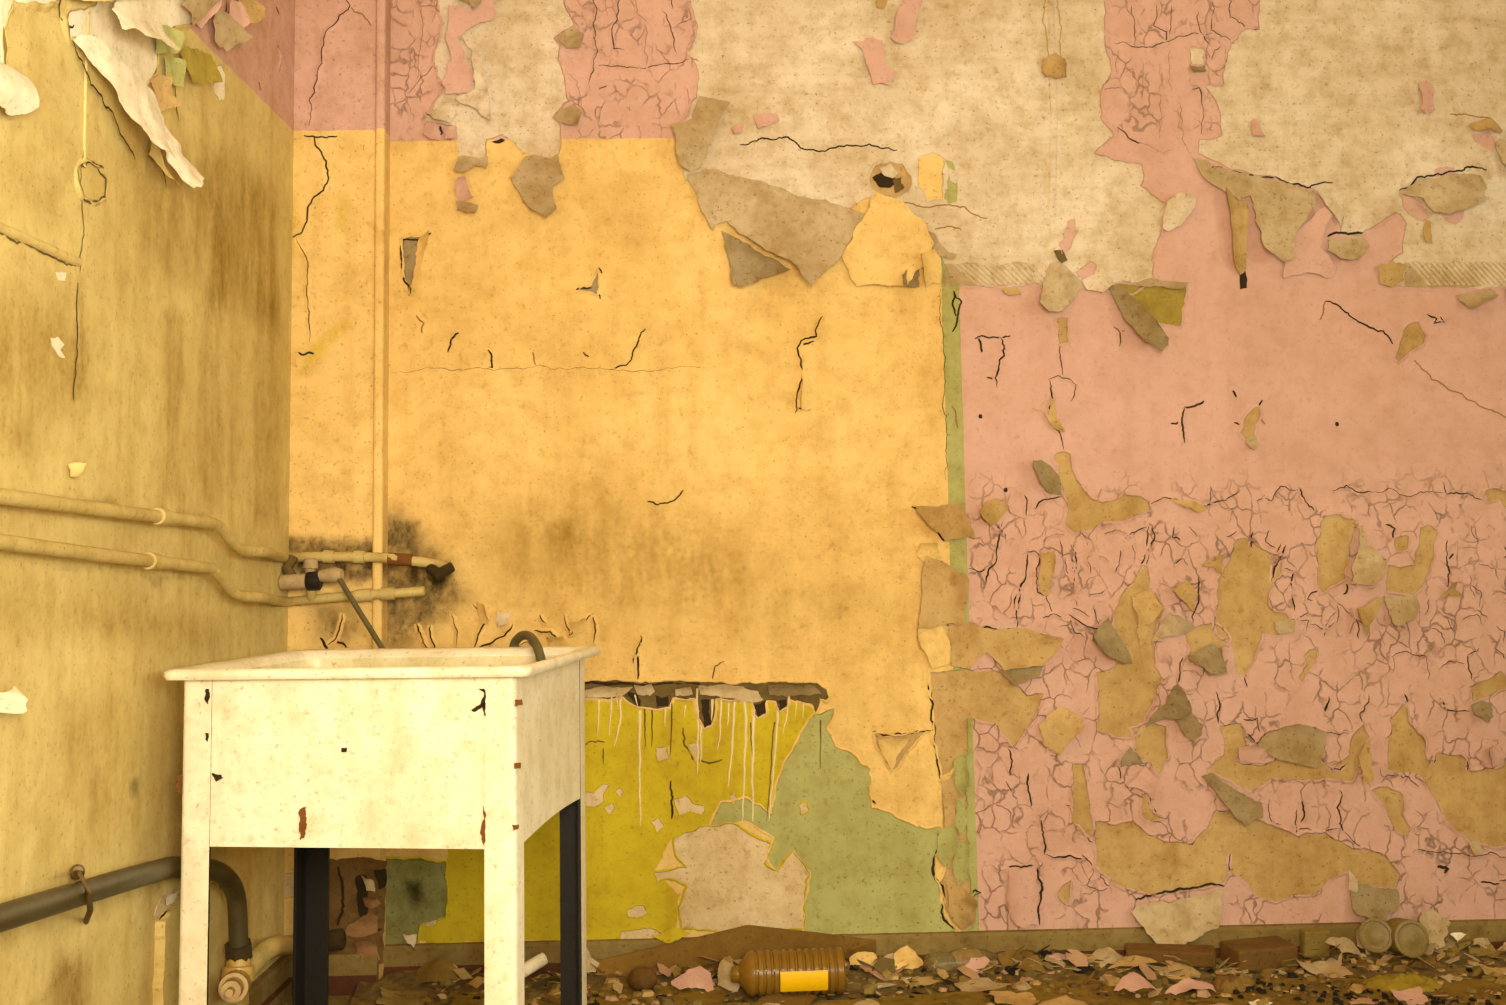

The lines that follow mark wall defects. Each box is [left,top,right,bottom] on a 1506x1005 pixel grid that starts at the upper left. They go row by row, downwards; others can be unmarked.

peeling [0,0,266,188]
peeling [421,0,584,217]
crack [566,0,699,120]
peeling [579,273,598,294]
peeling [671,0,1506,995]
damp [289,527,452,634]
crack [967,480,1506,738]
peeling [585,782,625,816]
spalling [619,791,810,943]
crack [971,748,1095,899]
crack [1264,788,1369,853]
crack [1382,754,1506,885]